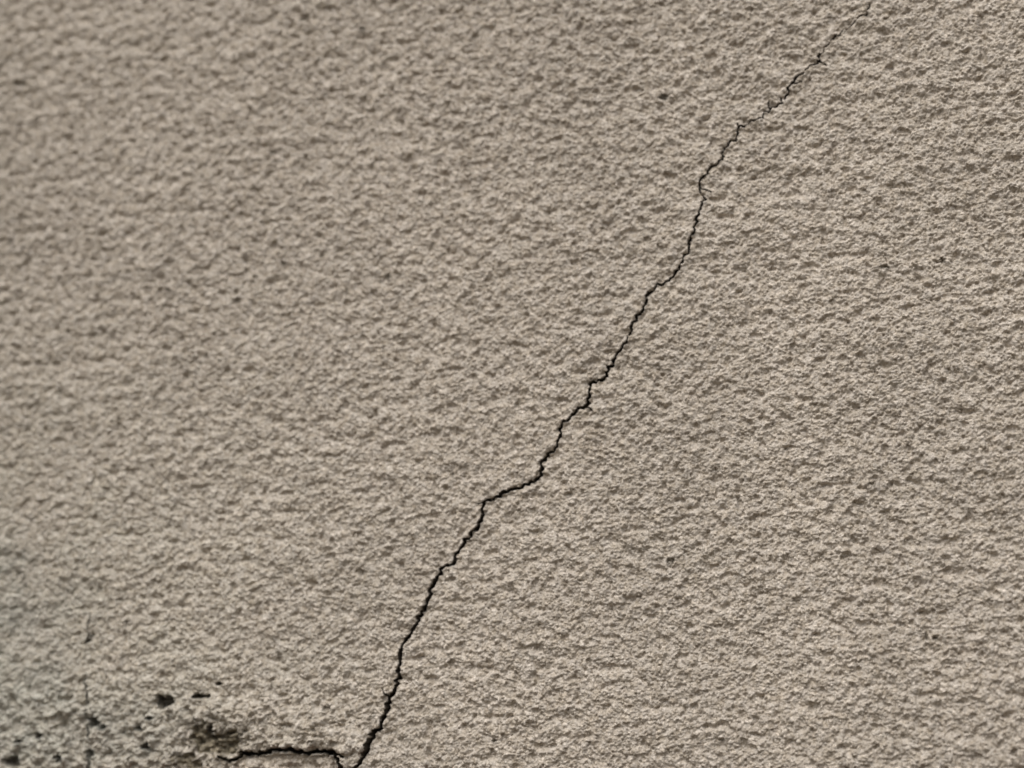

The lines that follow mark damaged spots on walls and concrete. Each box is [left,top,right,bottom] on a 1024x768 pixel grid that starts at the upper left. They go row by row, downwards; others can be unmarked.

crack [217,4,870,768]